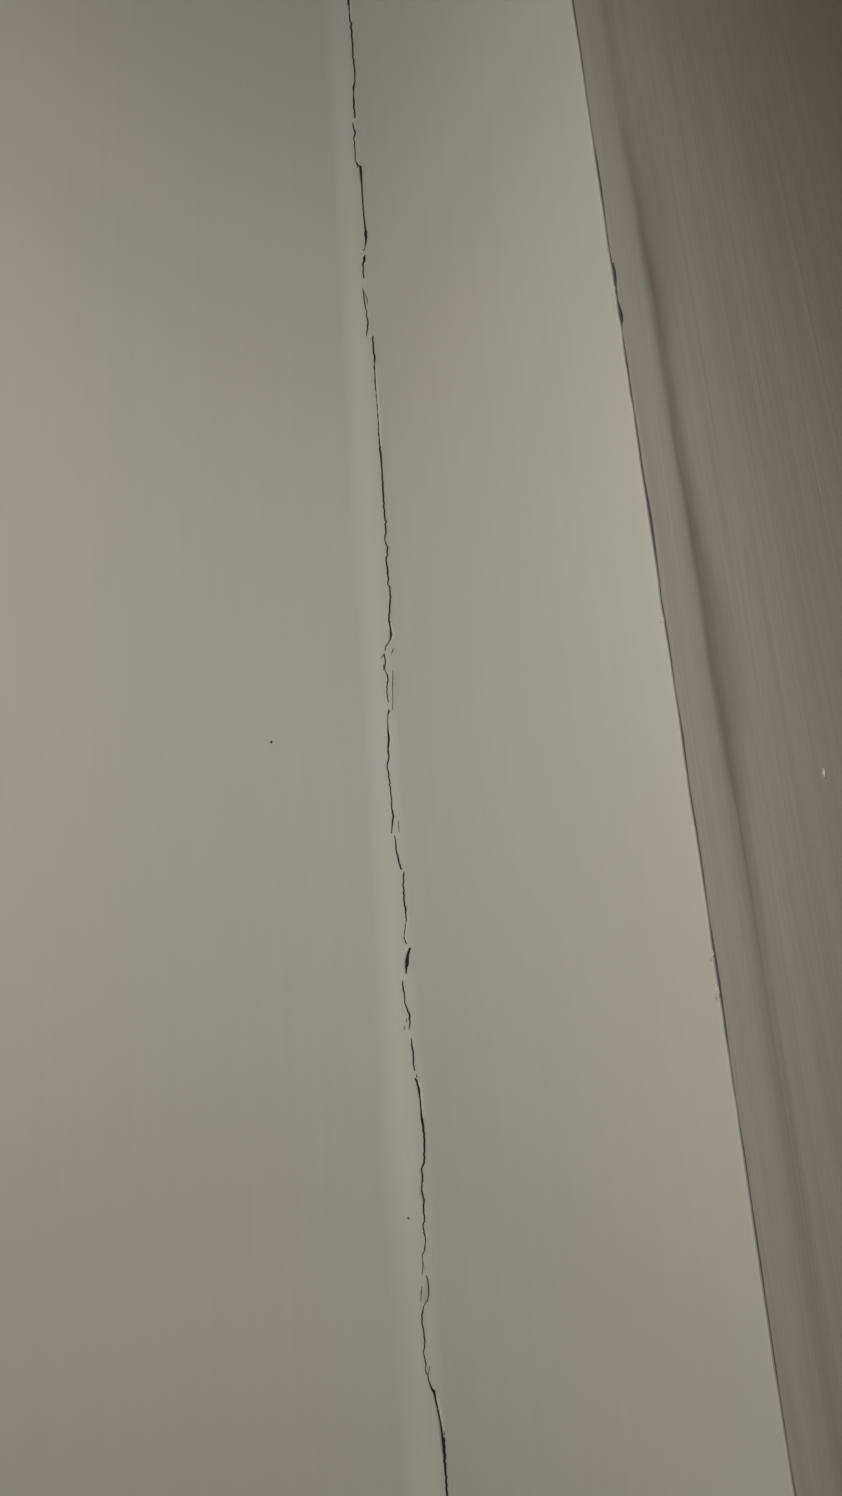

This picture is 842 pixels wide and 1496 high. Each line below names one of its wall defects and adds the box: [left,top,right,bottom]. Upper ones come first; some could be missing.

crack [347,0,448,1496]